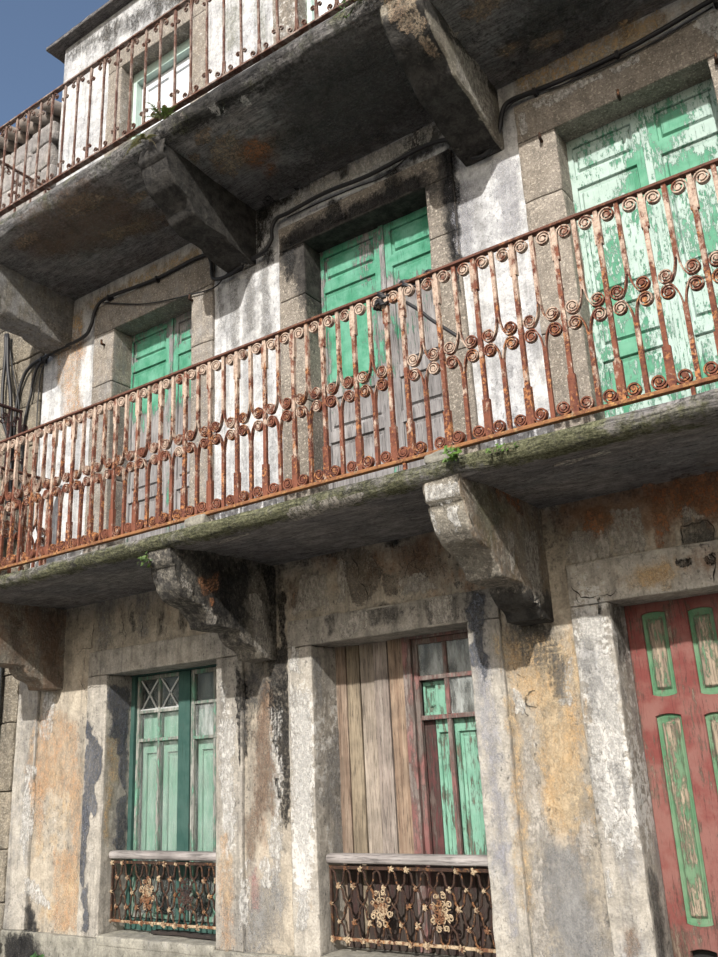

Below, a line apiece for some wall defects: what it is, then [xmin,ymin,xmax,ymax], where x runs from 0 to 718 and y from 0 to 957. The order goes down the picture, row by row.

water stain [217,19,427,345]
water stain [287,492,364,523]
water stain [107,684,131,850]
water stain [196,554,291,860]